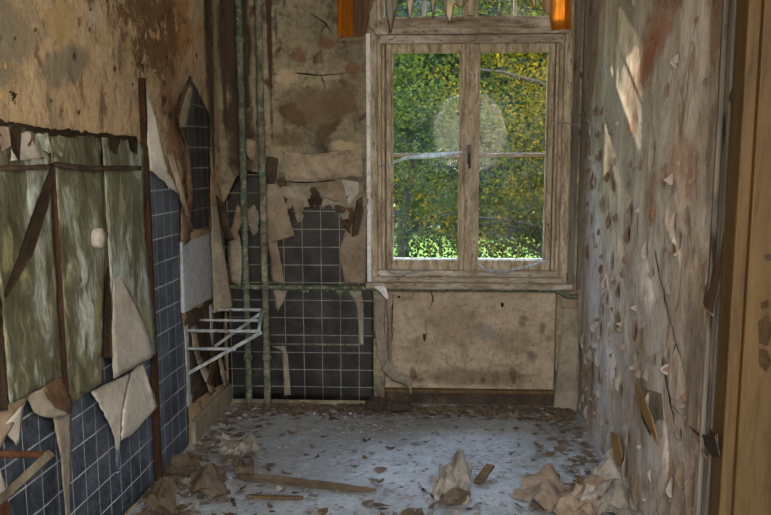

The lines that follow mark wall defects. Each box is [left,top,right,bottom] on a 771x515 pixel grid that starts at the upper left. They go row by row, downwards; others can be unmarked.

leakage [112,0,188,81]
leakage [204,0,255,172]
leakage [266,0,285,97]
corrosion [637,0,681,84]
spalling [0,119,138,161]
spalling [280,180,369,223]
peeling [662,205,689,257]
peeling [701,235,724,316]
peeling [578,150,670,507]
peeling [674,391,720,459]
peeling [665,462,695,507]